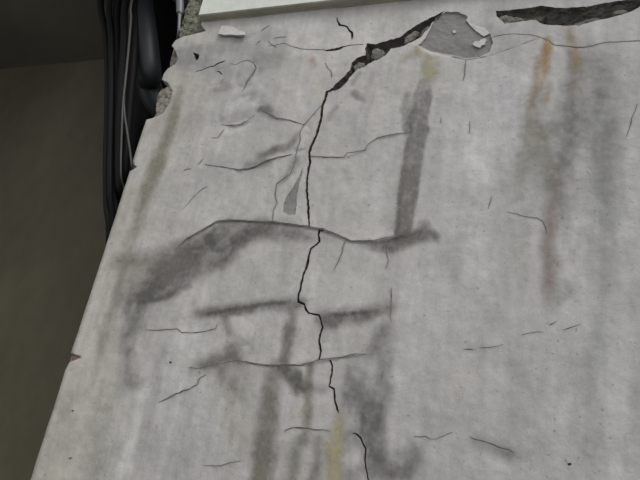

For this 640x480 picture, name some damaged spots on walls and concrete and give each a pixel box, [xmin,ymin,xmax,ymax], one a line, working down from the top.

spalling [179,0,205,38]
spalling [418,12,493,59]
spalling [496,0,640,26]
spalling [154,87,172,117]
water stain [374,92,436,251]
crack [159,11,444,413]
crack [148,325,217,333]
water stain [200,304,259,318]
water stain [281,325,312,392]
water stain [253,379,277,480]
crack [285,425,330,433]
crack [353,433,369,480]